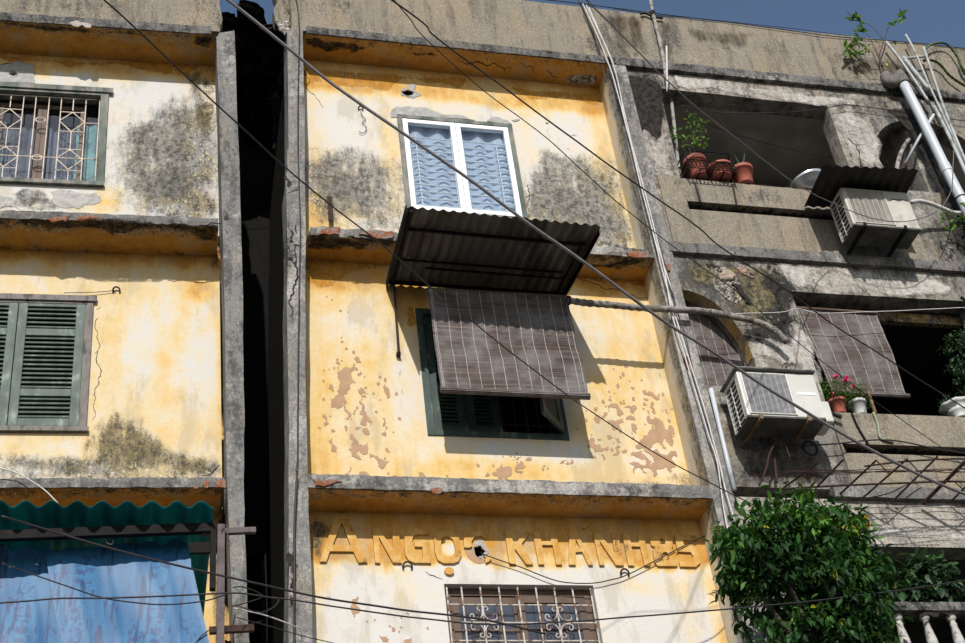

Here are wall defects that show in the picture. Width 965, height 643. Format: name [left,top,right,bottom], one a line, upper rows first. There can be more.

damp [54,60,211,204]
damp [312,148,390,217]
damp [531,151,624,235]
crack [93,308,102,416]
damp [85,415,207,474]
peeling [313,337,403,487]
peeling [476,452,532,480]
peeling [576,359,677,477]
spalling [706,263,755,305]
damp [689,260,951,382]